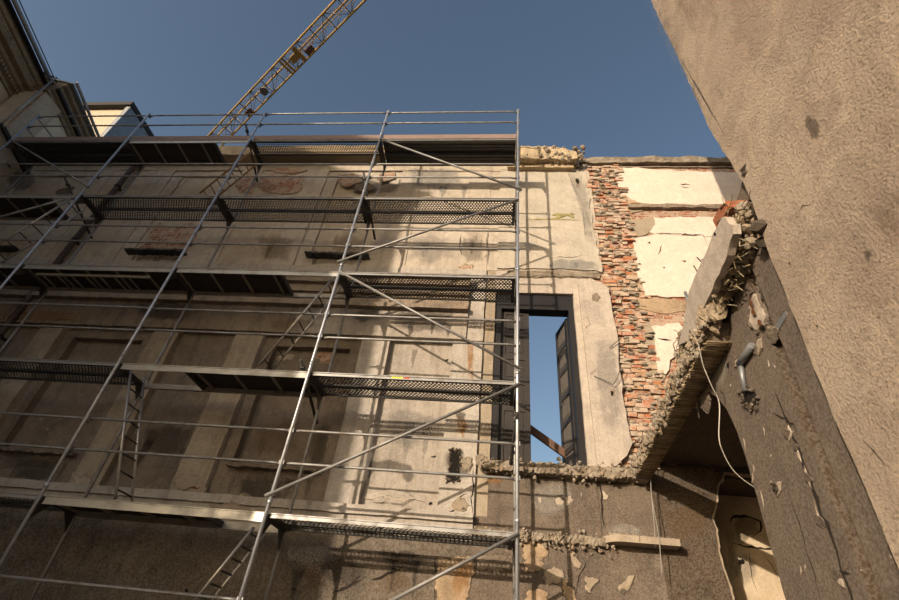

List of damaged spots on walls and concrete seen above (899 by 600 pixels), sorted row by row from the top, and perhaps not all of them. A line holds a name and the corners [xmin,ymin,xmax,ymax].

flaking render [139,222,200,253]
flaking render [625,201,655,244]
flaking render [628,252,687,382]
spalling [747,286,779,368]
peeling [699,388,712,414]
spalling [445,447,474,484]
peeling [555,493,582,506]
crack [774,390,853,600]
spalling [434,540,600,600]
peeling [617,574,635,594]
crack [730,514,779,588]